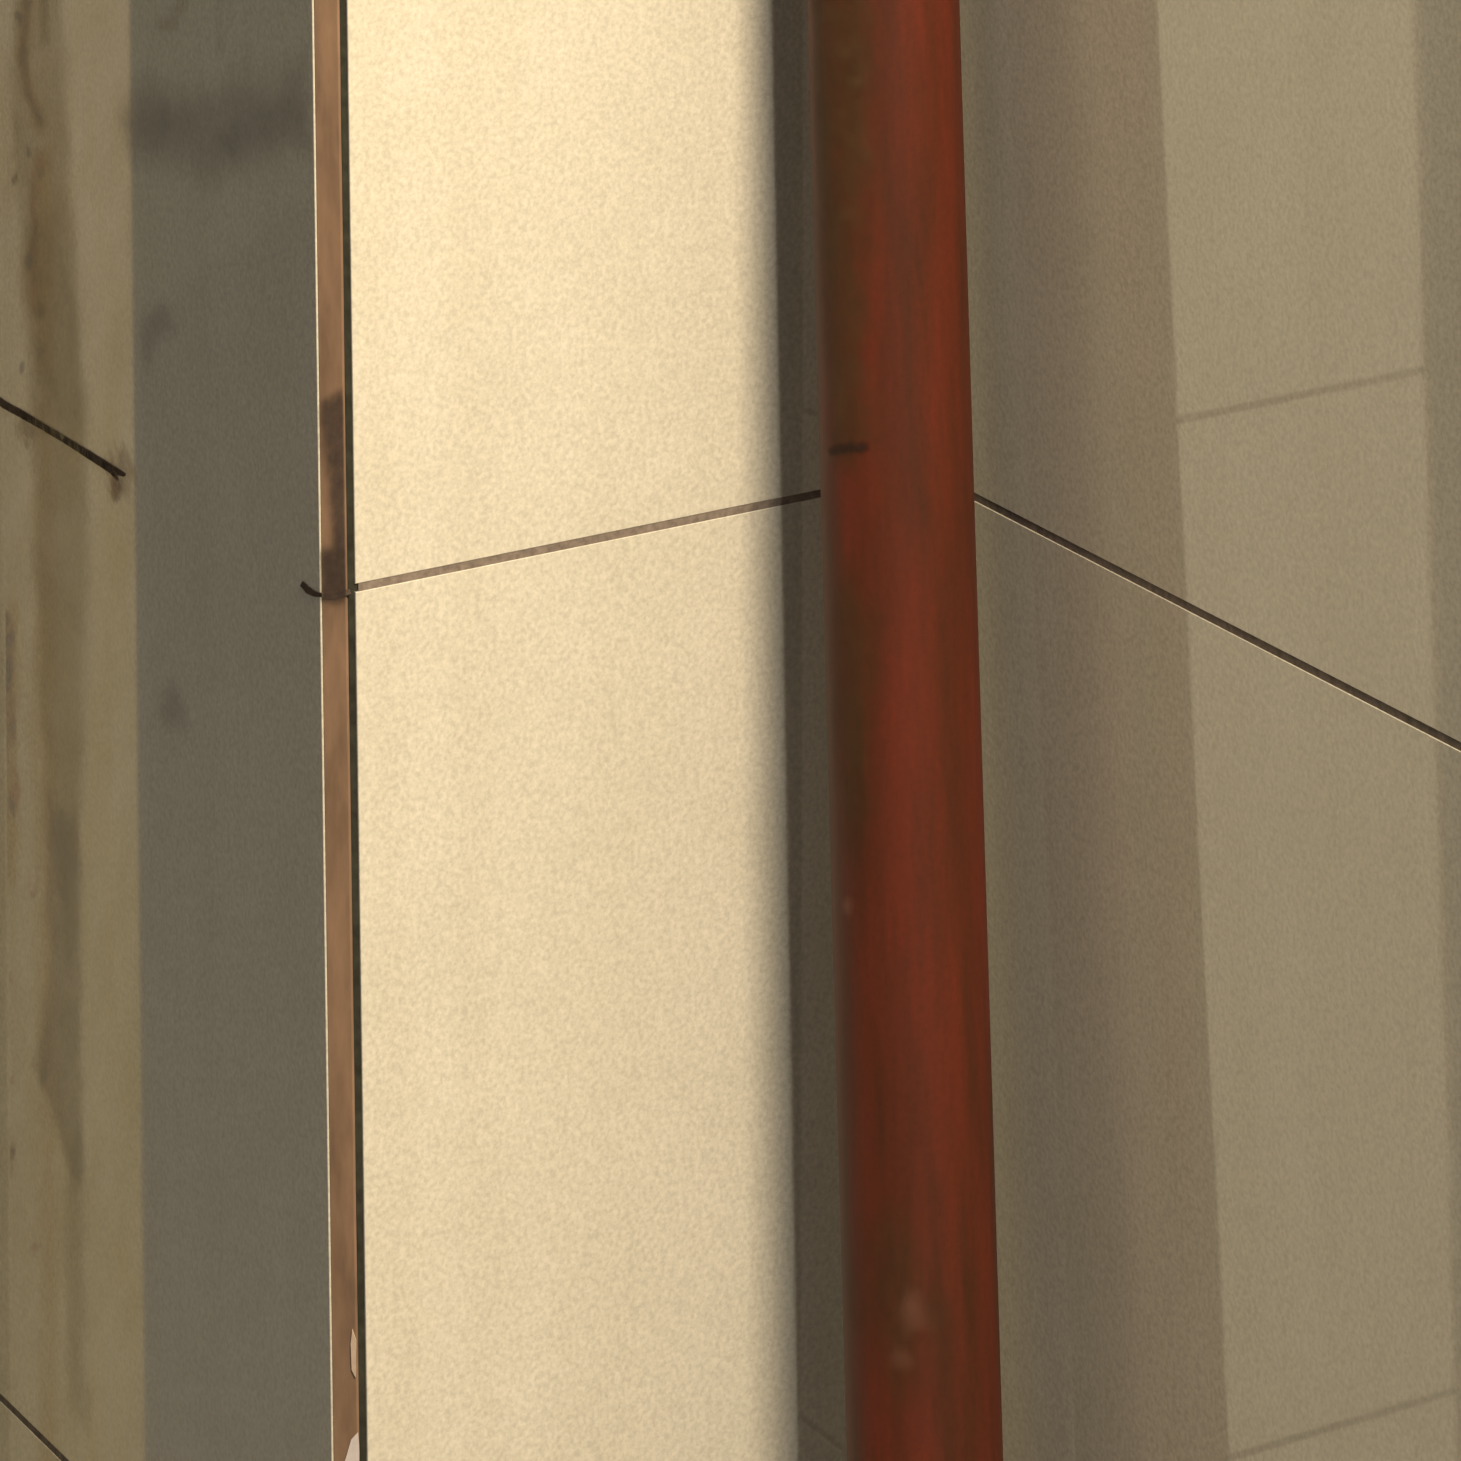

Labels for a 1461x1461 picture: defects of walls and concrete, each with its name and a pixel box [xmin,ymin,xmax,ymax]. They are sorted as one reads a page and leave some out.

crack [0,397,126,481]
peeling [345,1433,359,1461]